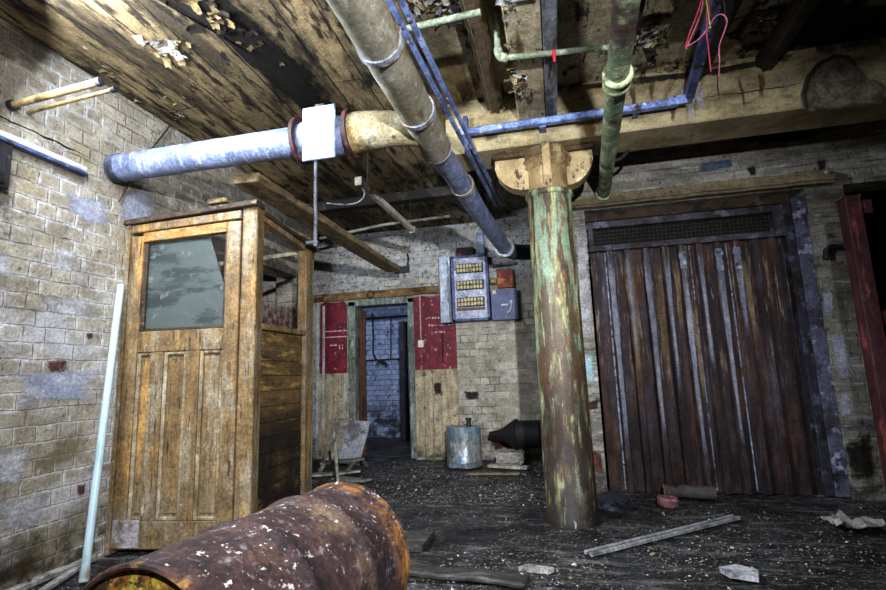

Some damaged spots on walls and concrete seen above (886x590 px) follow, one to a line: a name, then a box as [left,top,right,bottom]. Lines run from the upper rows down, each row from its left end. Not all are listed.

peeling [576,225,592,337]
peeling [585,355,594,382]
water stain [0,559,43,584]